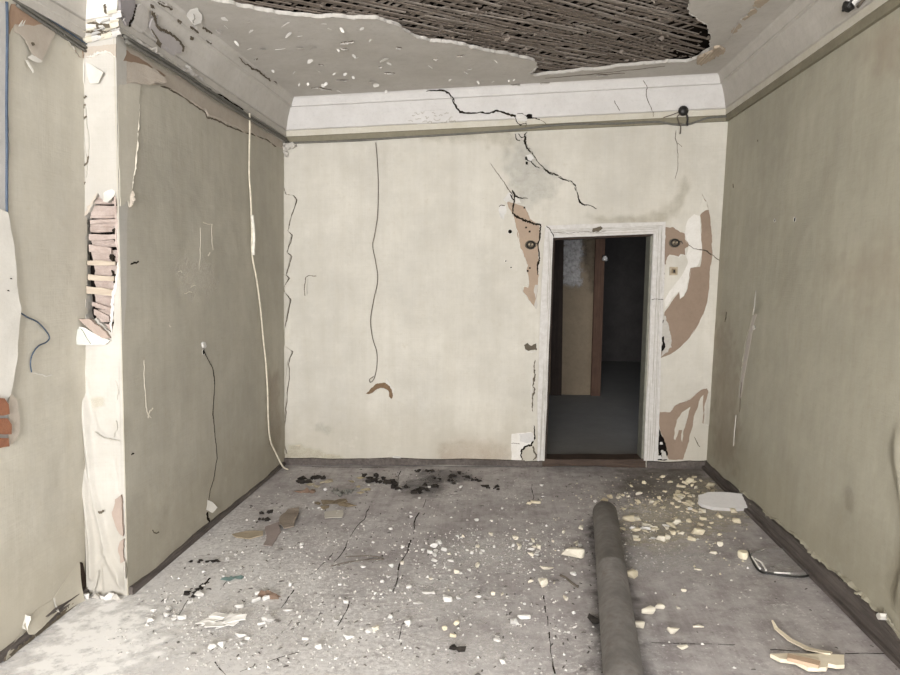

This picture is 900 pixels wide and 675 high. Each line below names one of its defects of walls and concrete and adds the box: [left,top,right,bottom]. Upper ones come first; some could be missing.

peeling [298,73,355,93]
crack [426,89,596,209]
crack [490,163,575,237]
spalling [84,189,119,333]
peeling [499,202,542,309]
peeling [661,194,713,358]
spalling [0,398,12,448]
peeling [658,388,711,461]
peeling [112,495,126,579]
spalling [83,593,122,601]